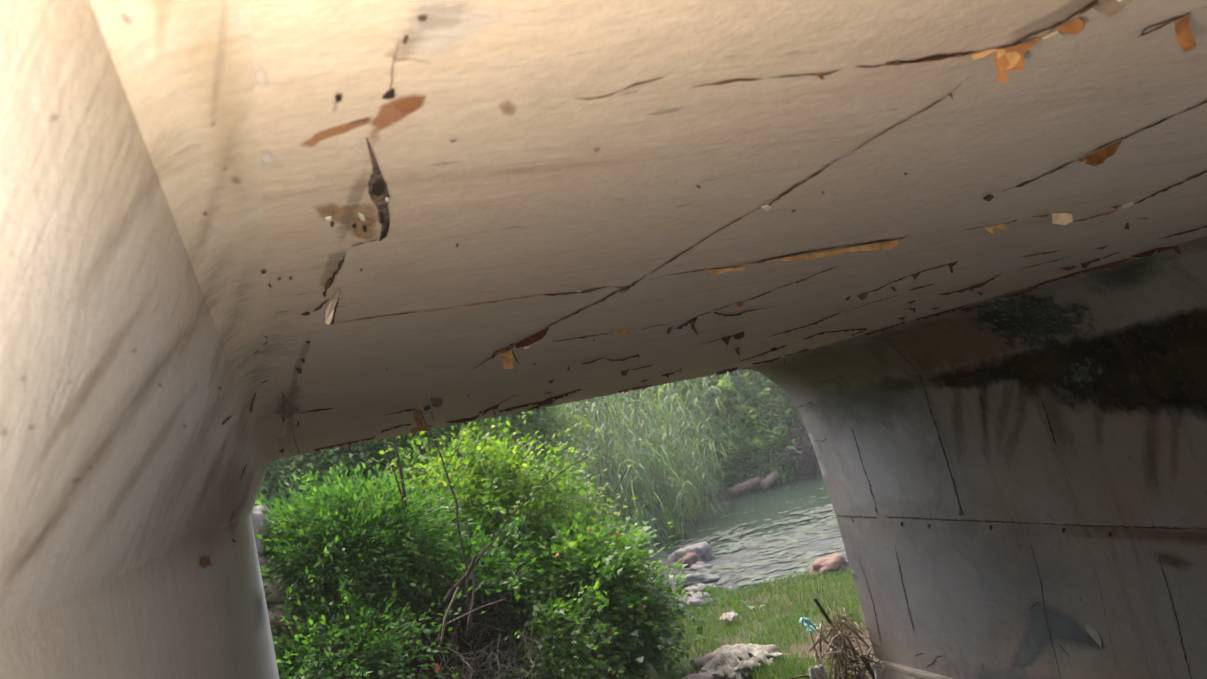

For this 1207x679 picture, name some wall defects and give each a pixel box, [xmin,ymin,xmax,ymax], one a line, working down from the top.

crack [382,41,428,99]
peeling [970,0,1132,83]
crack [1013,0,1098,45]
peeling [1138,12,1196,53]
crack [1121,101,1207,140]
peeling [318,137,390,241]
crack [301,52,974,342]
crack [964,160,1207,230]
peeling [757,235,909,262]
crack [740,245,1129,365]
crack [814,387,1207,679]
damp [862,536,1033,679]